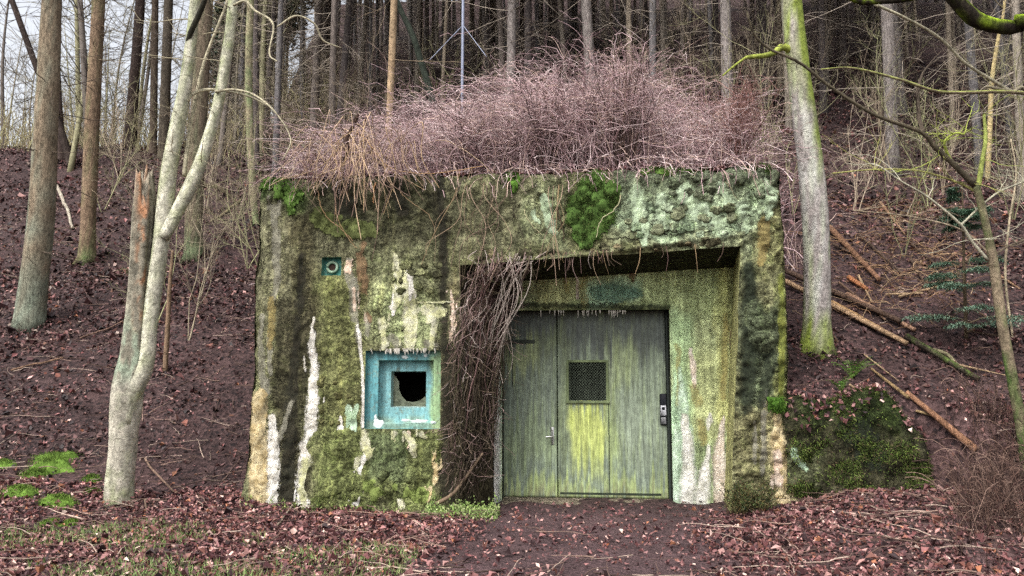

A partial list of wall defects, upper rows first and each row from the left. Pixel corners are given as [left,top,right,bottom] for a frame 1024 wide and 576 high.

flaking render [396,260,443,295]
damp [739,261,808,505]